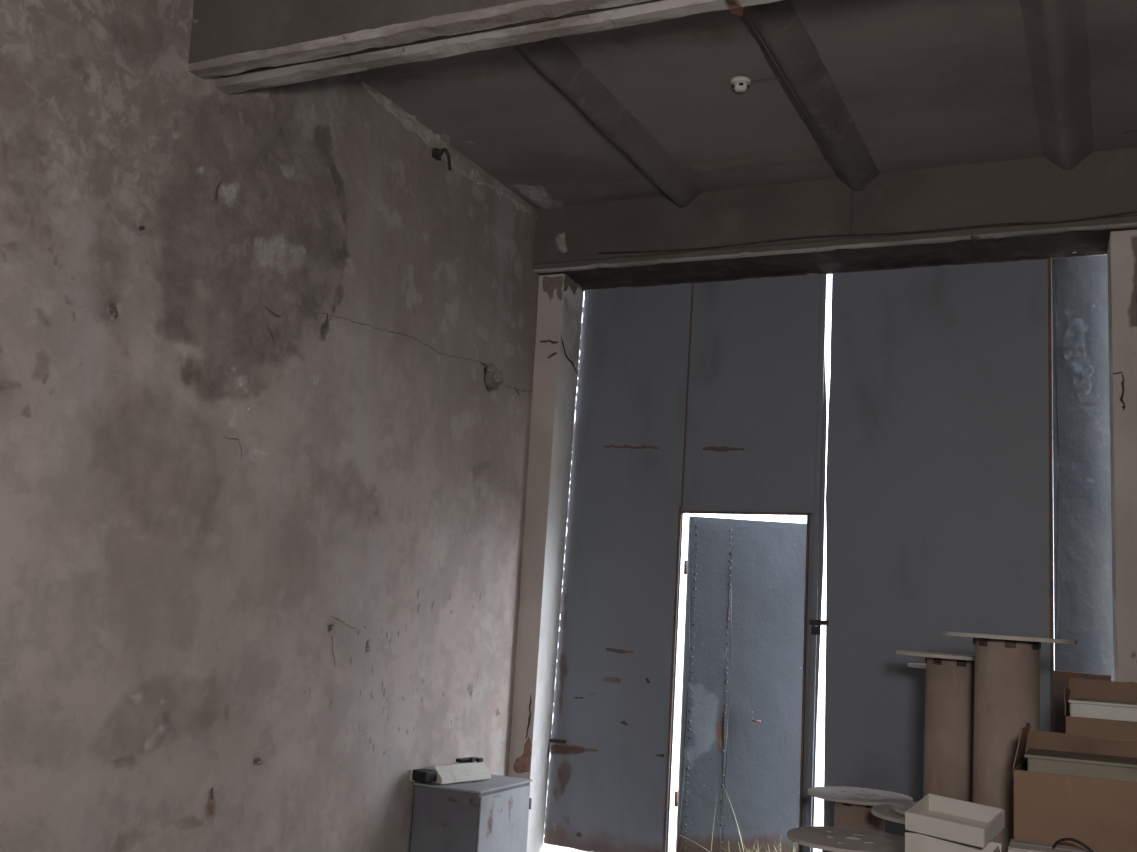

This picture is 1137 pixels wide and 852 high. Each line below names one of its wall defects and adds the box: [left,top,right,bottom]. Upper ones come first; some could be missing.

leakage [158,98,349,396]
crack [285,302,533,394]
corrosion [551,744,597,790]